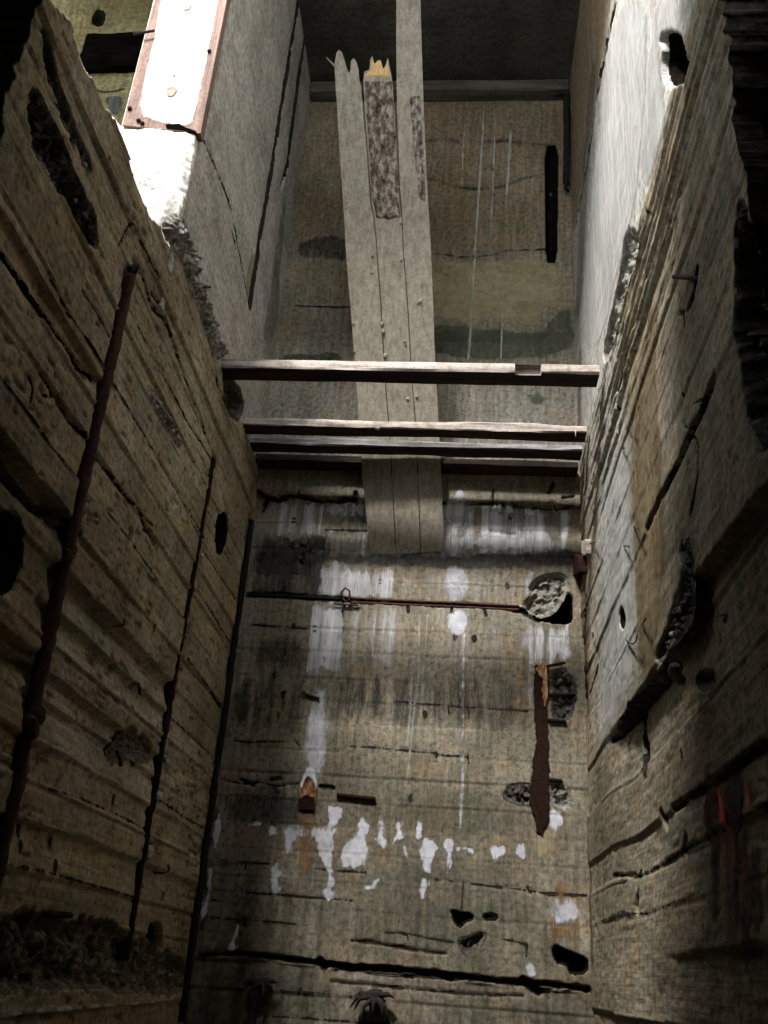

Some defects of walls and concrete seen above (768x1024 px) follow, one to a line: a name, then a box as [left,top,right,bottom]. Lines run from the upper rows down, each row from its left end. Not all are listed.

hole [668,32,690,86]
crack [0,222,545,623]
corrosion [0,272,136,889]
spalling [523,573,573,625]
spalling [657,539,717,692]
corrosion [115,456,216,961]
damp [213,490,572,901]
spalling [502,783,531,807]
corrosion [527,661,575,857]
efflorescence [200,868,213,918]
crack [198,931,590,1024]
spalling [451,910,499,957]